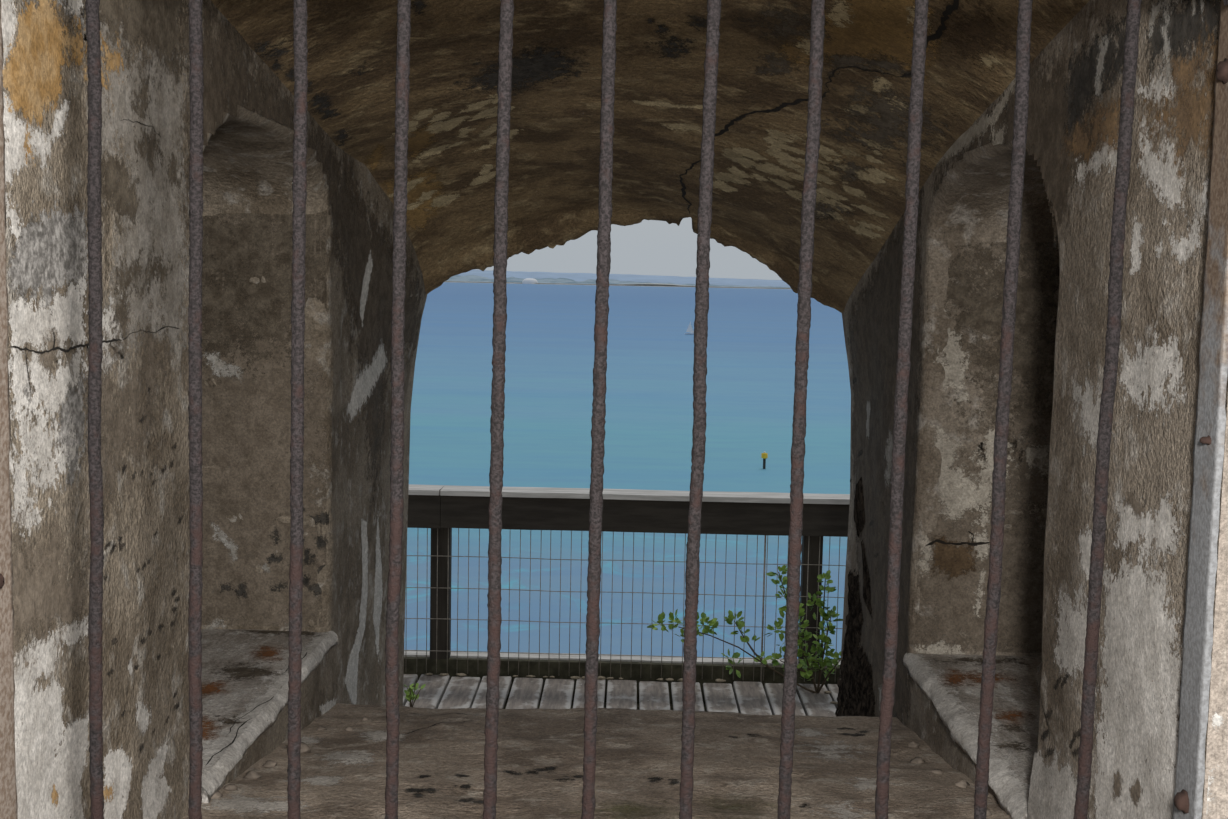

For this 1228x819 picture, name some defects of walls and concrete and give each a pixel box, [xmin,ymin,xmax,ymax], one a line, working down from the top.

leakage [1141,0,1221,90]
crack [679,0,959,214]
crack [11,326,180,393]
leakage [734,0,1127,736]
peeling [1067,362,1118,456]
peeling [1118,324,1187,426]
peeling [1037,490,1185,819]
leakage [405,775,436,798]
leakage [454,774,483,804]
leakage [504,766,583,782]
leakage [995,725,1029,751]
peeling [1024,709,1080,819]